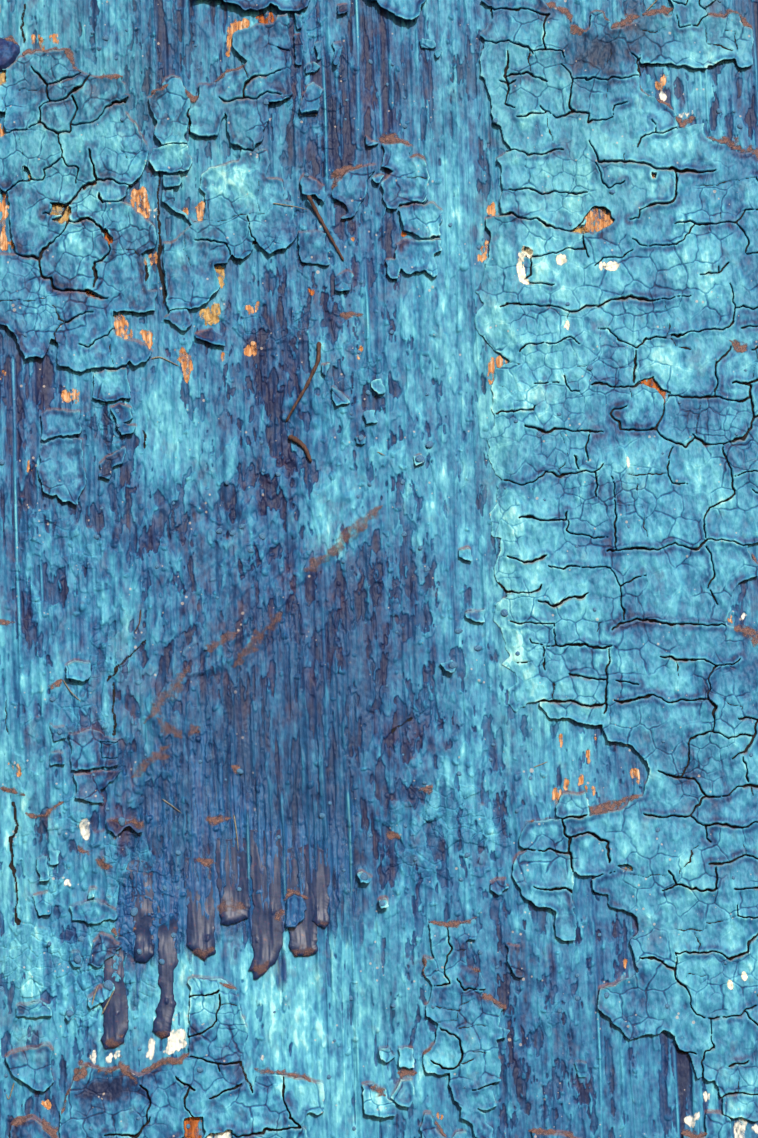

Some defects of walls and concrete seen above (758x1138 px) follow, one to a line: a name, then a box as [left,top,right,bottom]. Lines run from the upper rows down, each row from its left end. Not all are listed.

crack [0,4,284,364]
crack [399,176,428,206]
corrosion [306,506,382,571]
peeling [458,547,472,561]
peeling [465,0,758,1138]
crack [484,0,758,1098]
corrosion [132,669,199,777]
crack [104,1085,151,1138]
crack [175,990,253,1138]
crack [232,1076,302,1138]
peeling [362,919,510,1138]